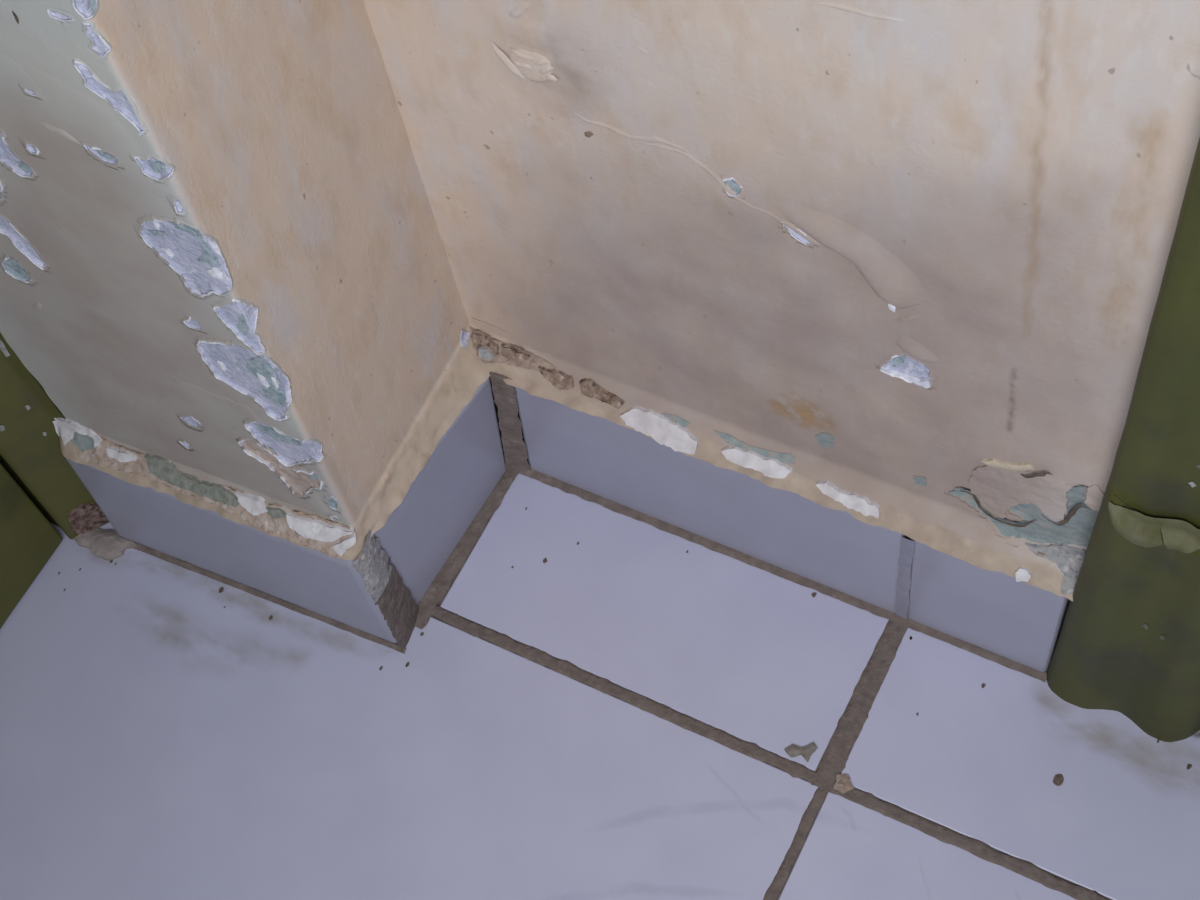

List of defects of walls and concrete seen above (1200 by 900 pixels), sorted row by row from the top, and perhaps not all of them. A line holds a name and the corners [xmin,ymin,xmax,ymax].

peeling [45,0,149,135]
peeling [0,128,49,283]
peeling [81,142,175,182]
crack [573,112,827,248]
spalling [43,198,357,558]
spalling [460,326,625,409]
peeling [878,336,939,388]
spalling [947,458,1104,594]